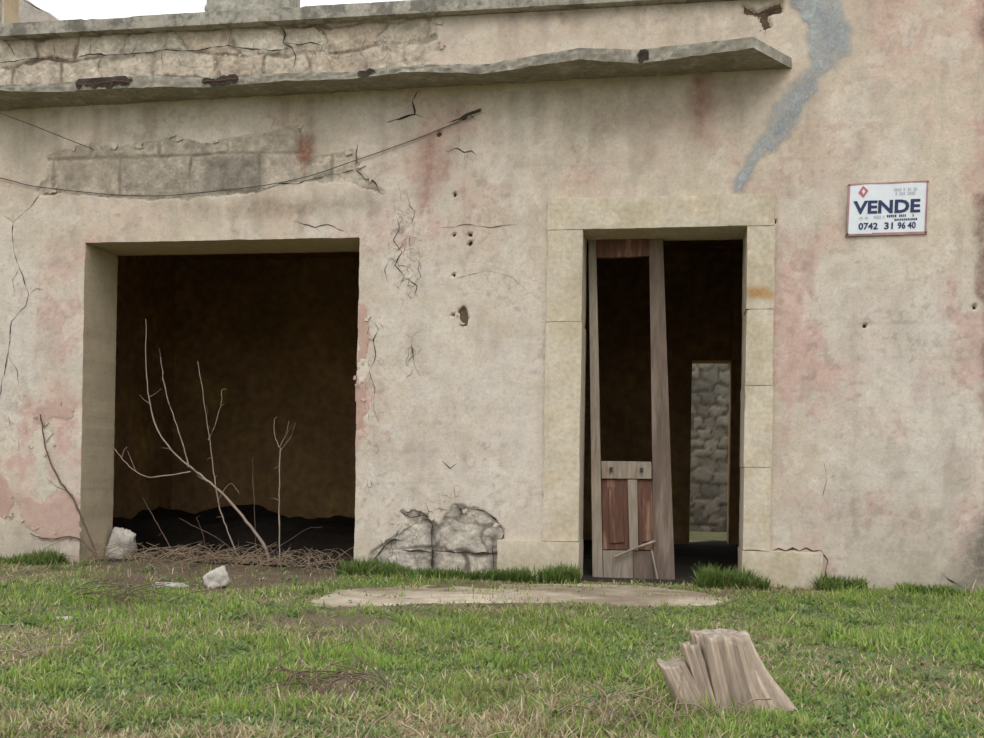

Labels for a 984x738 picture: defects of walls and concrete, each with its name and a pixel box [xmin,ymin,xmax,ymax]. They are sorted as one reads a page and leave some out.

spalling [19,0,59,23]
crack [0,25,424,84]
flaking render [0,16,446,90]
flaking render [42,122,385,201]
crack [389,91,423,122]
crack [445,108,482,172]
crack [255,145,515,298]
crack [0,194,43,394]
flaking render [456,307,469,326]
peeling [0,401,82,542]
flaking render [370,504,504,574]
crack [775,547,828,575]